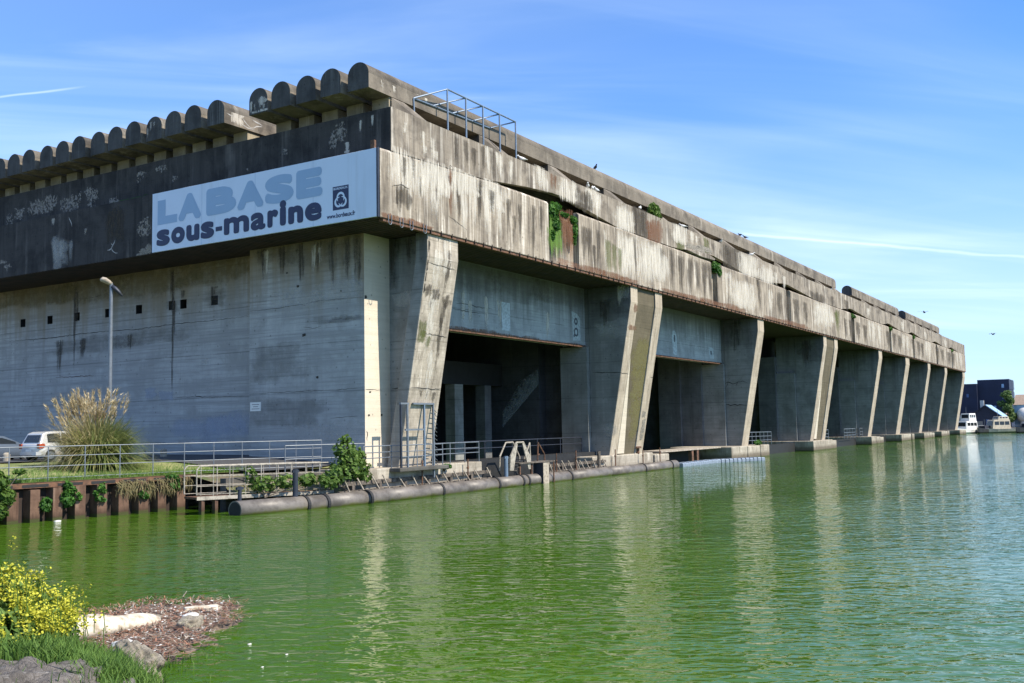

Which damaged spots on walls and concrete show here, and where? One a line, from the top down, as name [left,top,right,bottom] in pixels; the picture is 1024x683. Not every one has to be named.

water stain [391,131,562,253]
water stain [534,165,601,216]
water stain [299,237,361,278]
rust [559,211,637,284]
water stain [582,206,712,323]
water stain [720,245,962,366]
water stain [629,366,645,438]